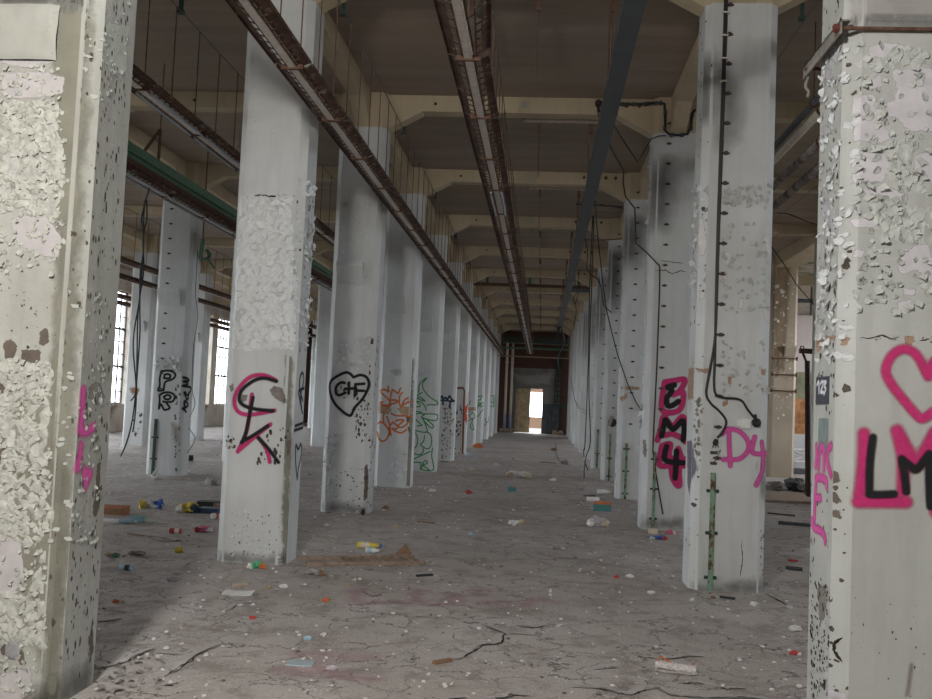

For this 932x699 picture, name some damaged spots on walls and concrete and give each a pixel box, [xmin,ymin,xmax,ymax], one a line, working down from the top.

peeling [80,1,130,126]
peeling [0,59,119,316]
peeling [232,177,317,352]
peeling [814,0,932,415]
peeling [0,284,111,699]
crack [95,642,223,677]
crack [442,624,545,659]
crack [441,654,769,699]
crack [832,637,843,662]